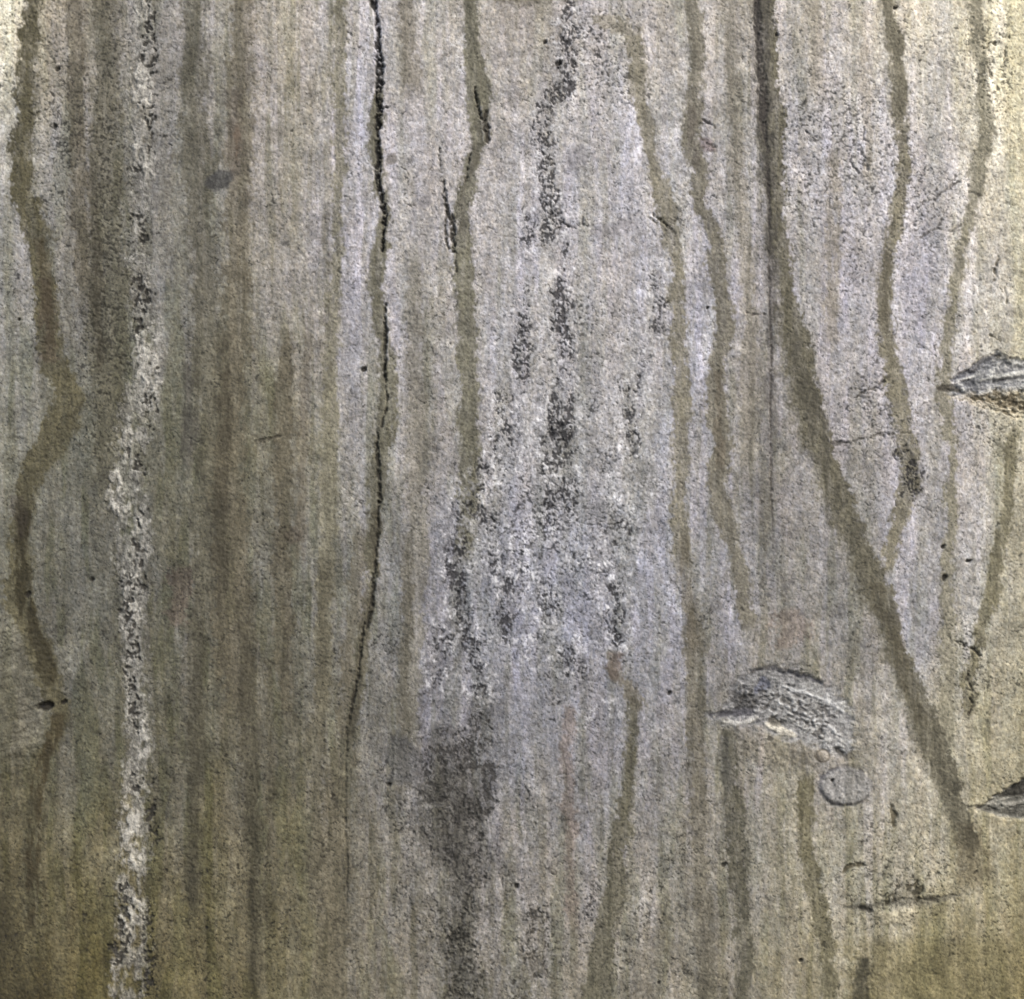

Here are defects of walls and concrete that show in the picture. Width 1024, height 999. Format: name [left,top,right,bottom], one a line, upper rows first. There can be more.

crack [368,0,389,253]
crack [437,85,491,274]
leakage [0,0,435,999]
crack [341,302,391,906]
spalling [696,662,863,763]
leakage [576,0,1024,999]
spalling [935,349,1024,422]
spalling [965,776,1024,822]